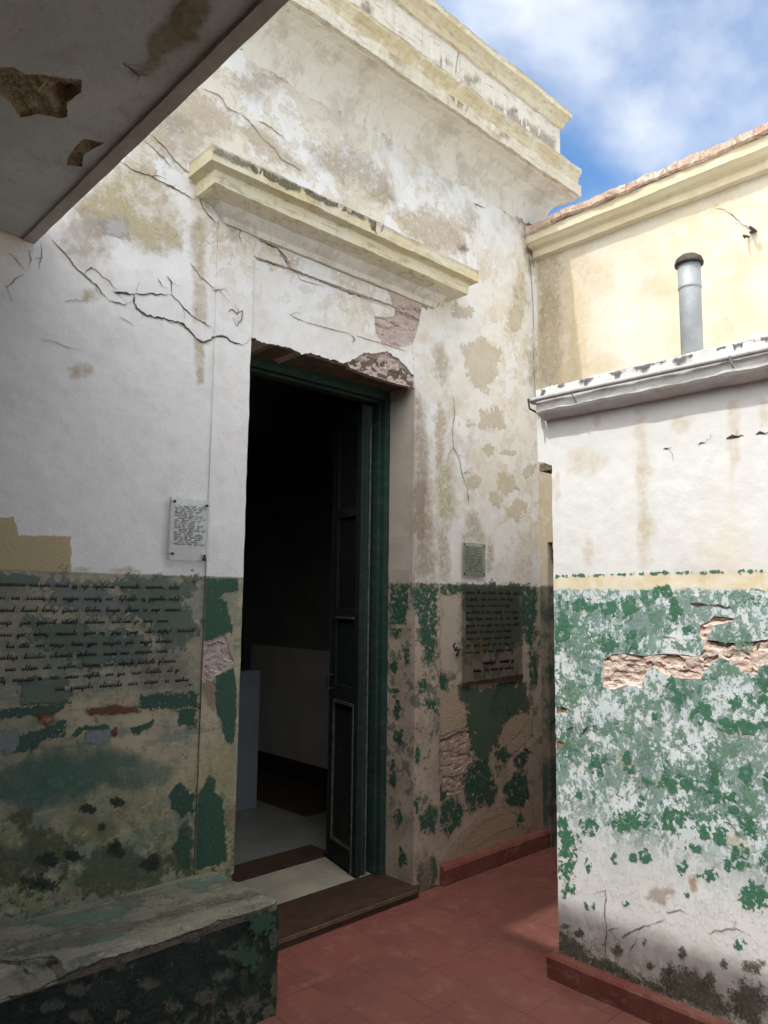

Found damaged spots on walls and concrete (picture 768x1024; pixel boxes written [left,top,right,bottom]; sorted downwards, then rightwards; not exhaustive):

spalling [0,67,82,118]
spalling [67,139,104,167]
crack [205,89,302,171]
crack [126,135,391,306]
crack [5,240,248,345]
spalling [345,291,440,389]
crack [449,398,471,504]
peeling [0,517,265,961]
peeling [388,578,540,890]
peeling [554,569,768,913]
peeling [195,909,278,1006]
crack [579,891,686,967]